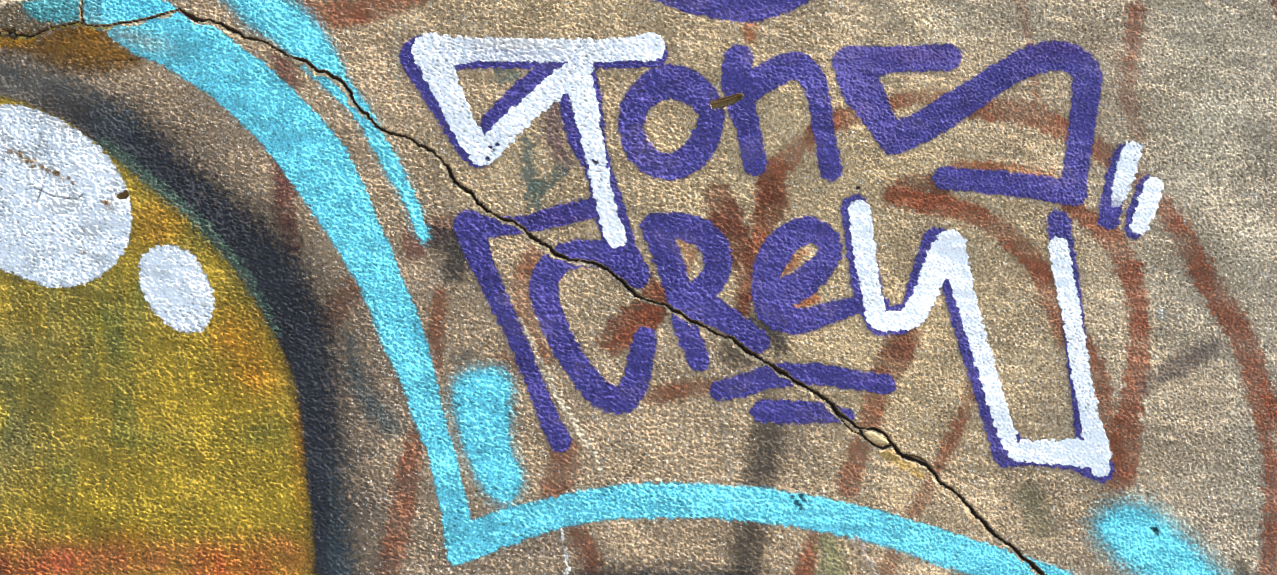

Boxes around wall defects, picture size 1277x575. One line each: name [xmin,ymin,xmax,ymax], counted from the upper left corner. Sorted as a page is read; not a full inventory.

crack [9,26,55,40]
crack [58,0,1047,575]